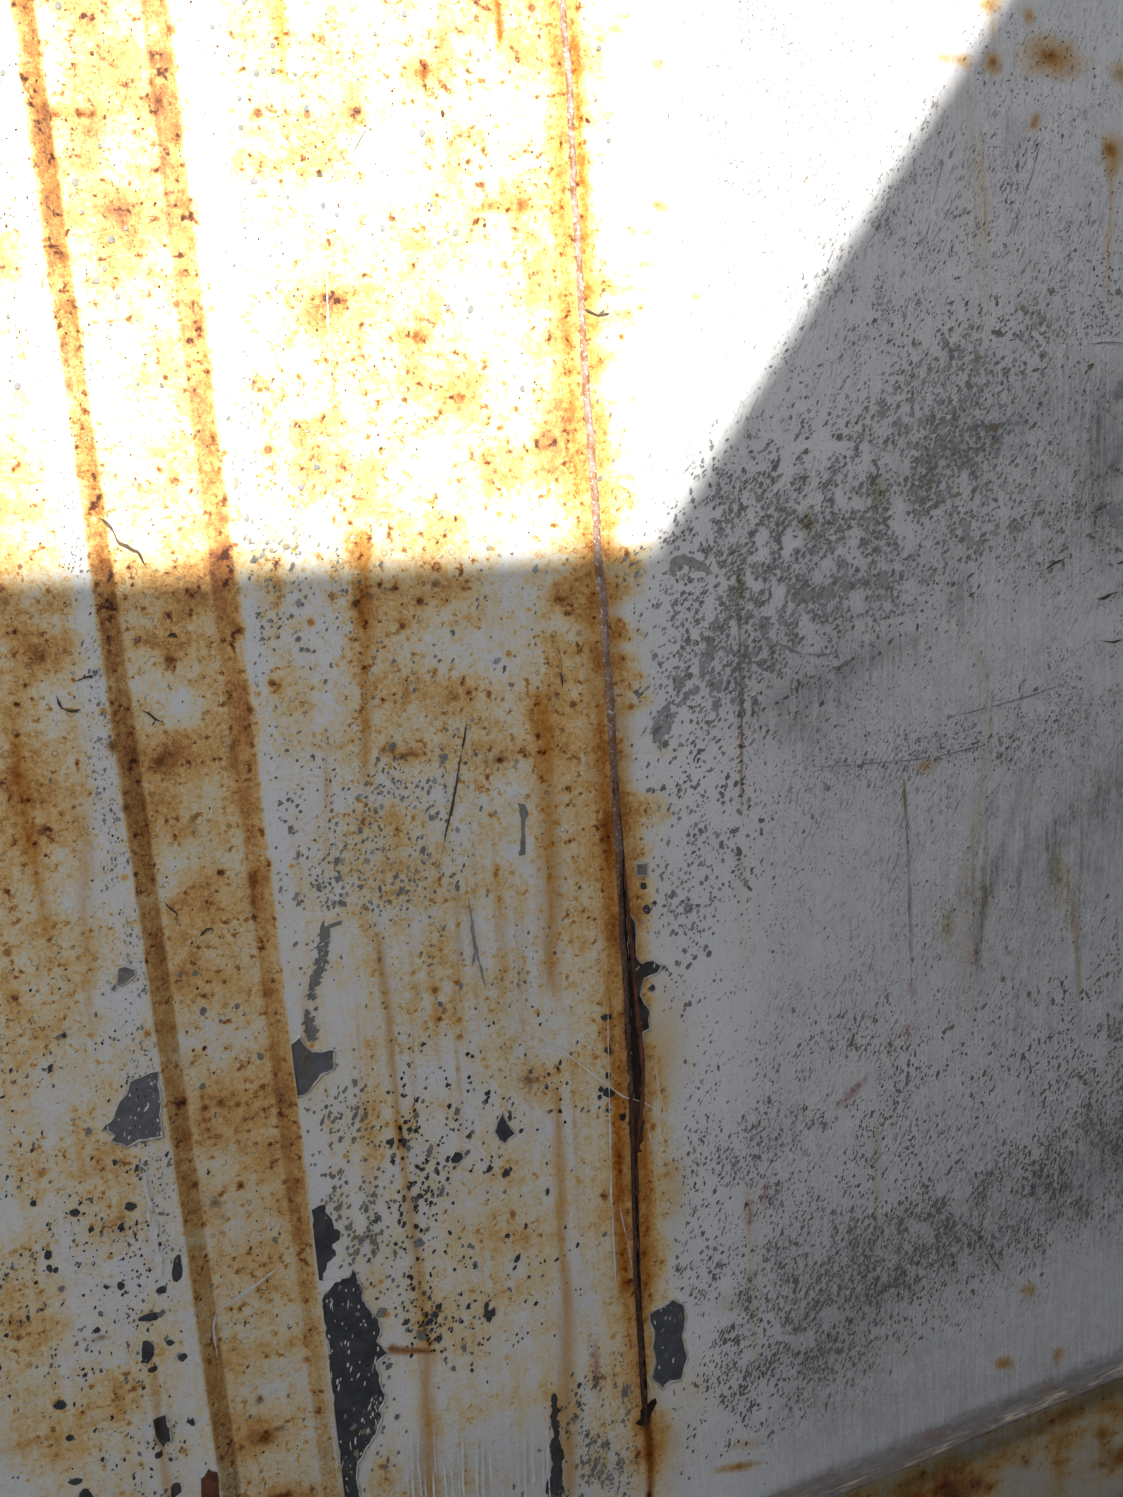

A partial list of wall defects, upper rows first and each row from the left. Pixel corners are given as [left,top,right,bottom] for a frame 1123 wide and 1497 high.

peeling [0,0,638,1497]
peeling [598,0,1123,1480]